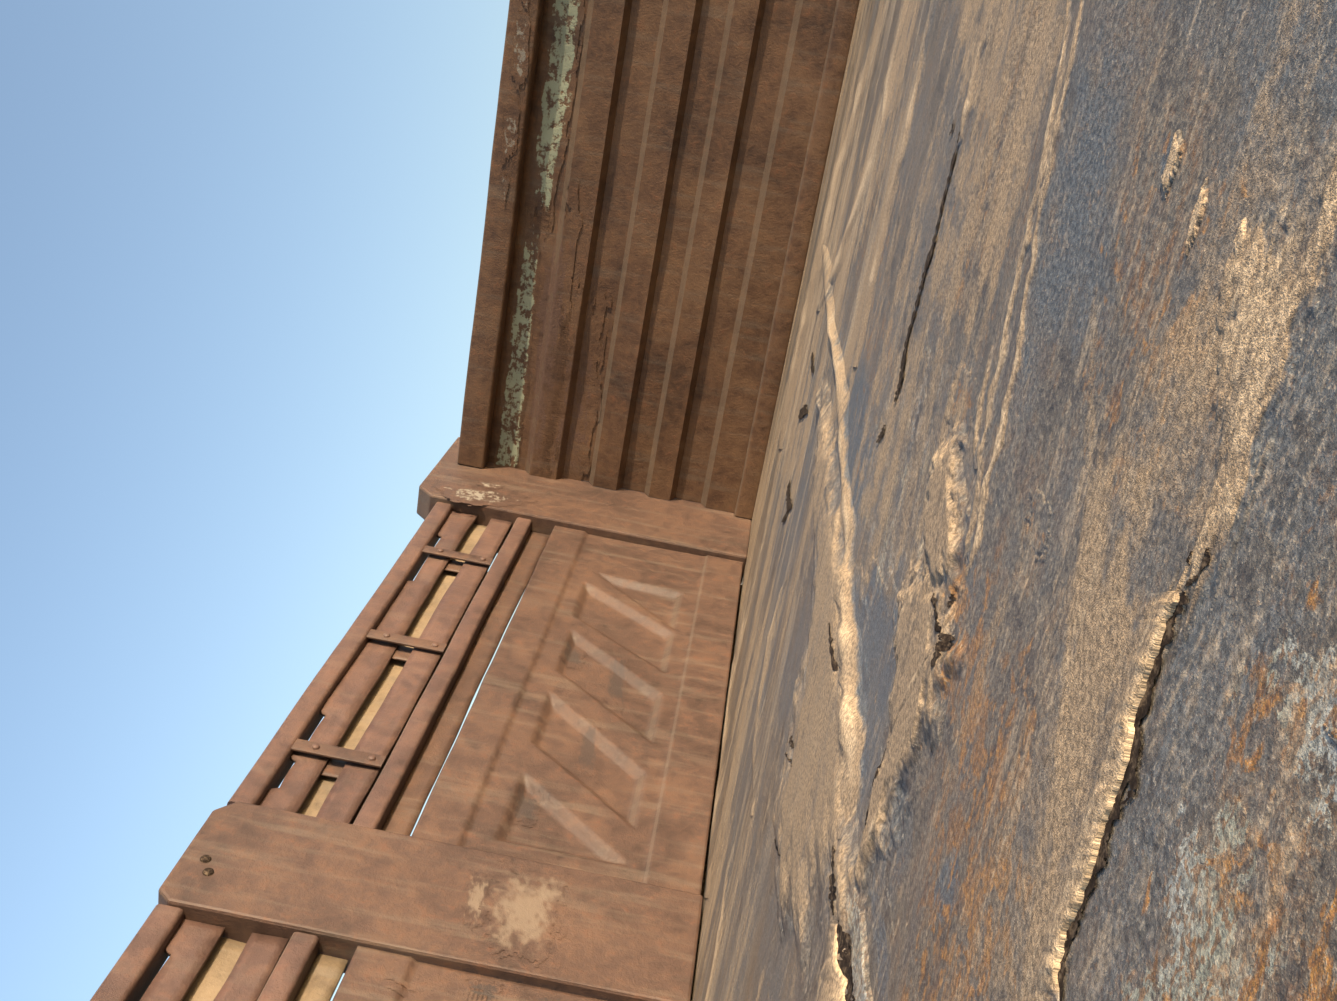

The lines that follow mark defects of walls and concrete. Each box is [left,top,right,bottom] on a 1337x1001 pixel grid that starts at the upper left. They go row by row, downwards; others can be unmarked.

peeling [494,0,585,469]
crack [876,120,960,443]
peeling [434,479,537,507]
crack [828,623,838,670]
crack [865,749,886,825]
crack [1025,547,1210,1001]
crack [819,846,855,1001]